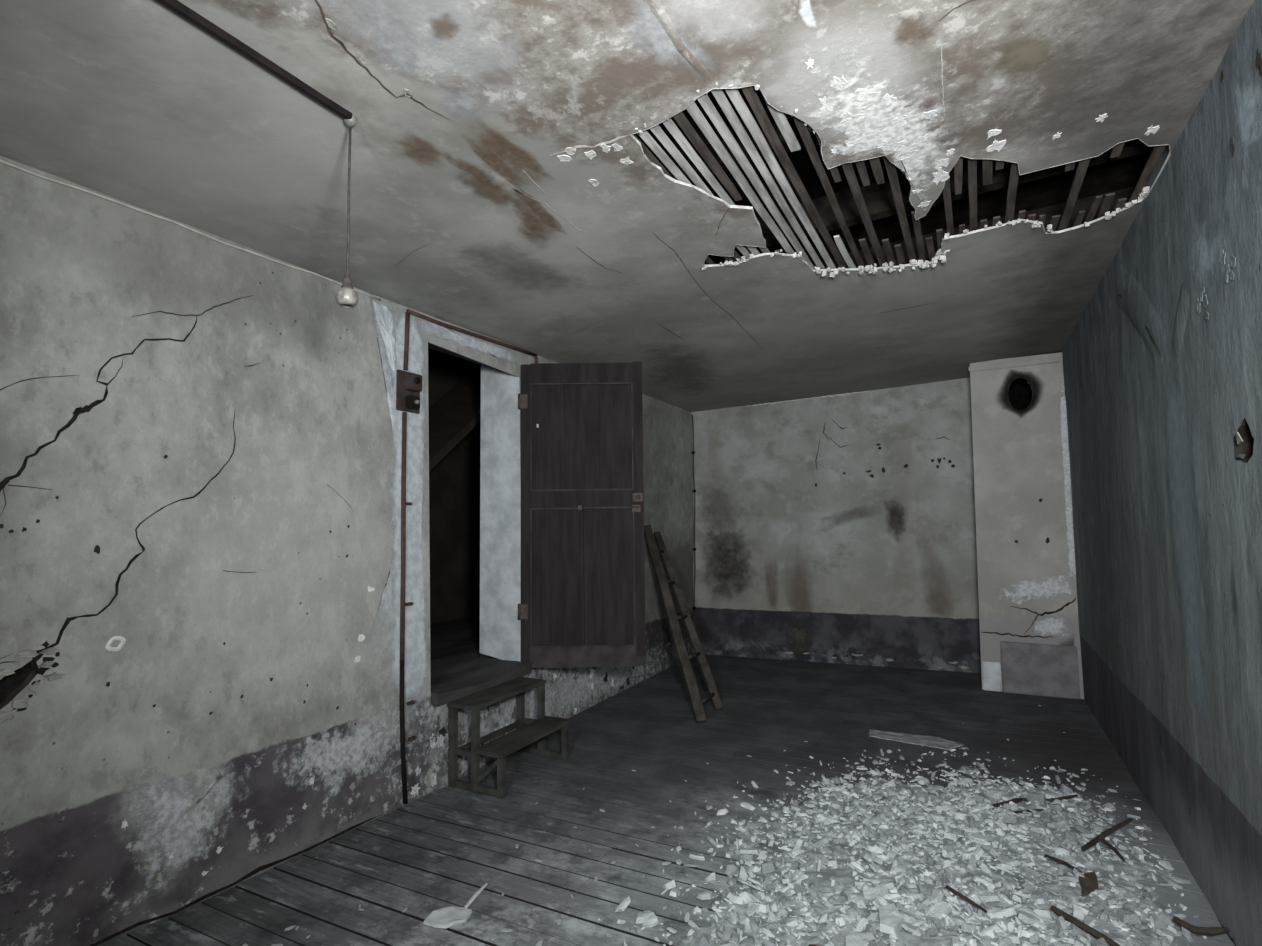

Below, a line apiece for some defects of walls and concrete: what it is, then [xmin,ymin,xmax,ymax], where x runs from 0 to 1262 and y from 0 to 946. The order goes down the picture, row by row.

damp [799,0,816,27]
damp [899,19,927,40]
crack [315,0,450,120]
peeling [801,47,958,208]
peeling [986,129,1006,152]
damp [1235,84,1262,147]
damp [465,176,508,202]
crack [0,295,253,516]
damp [888,507,904,535]
crack [0,411,236,723]
damp [707,536,747,595]
crack [981,598,1076,638]